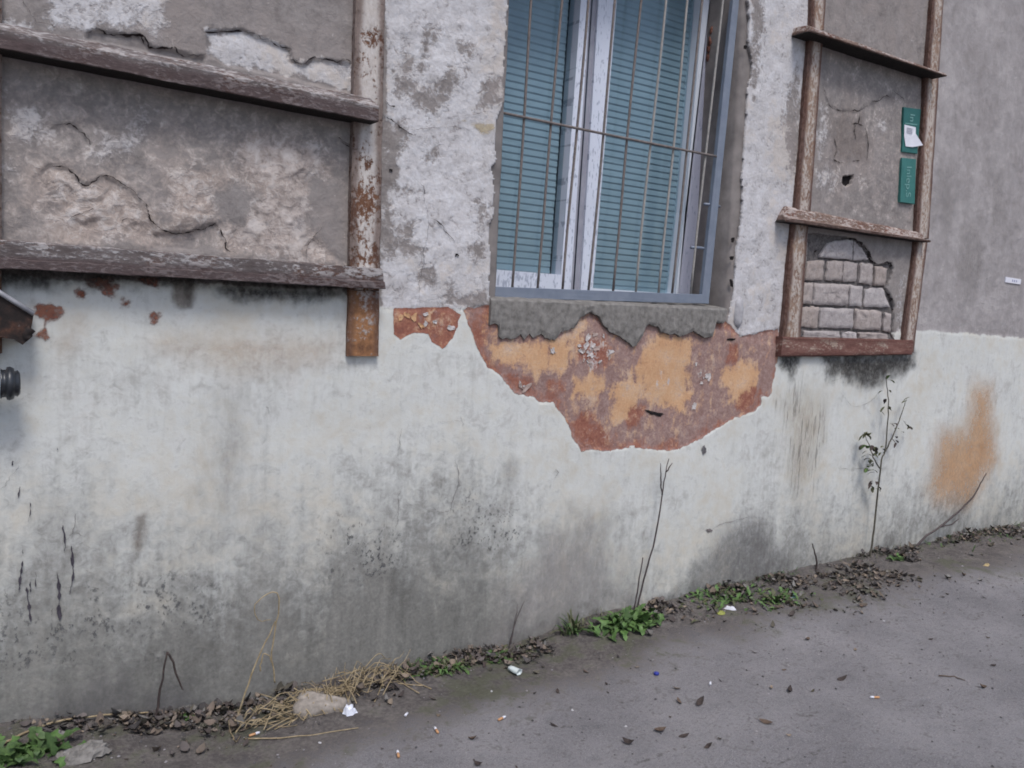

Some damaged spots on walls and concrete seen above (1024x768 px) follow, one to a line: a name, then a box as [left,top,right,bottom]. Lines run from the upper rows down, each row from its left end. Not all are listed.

crack [89,28,351,65]
crack [824,90,904,163]
crack [49,164,231,252]
rust [34,304,64,340]
rust [74,278,119,298]
flaking render [800,233,895,339]
peeling [393,305,779,455]
rust [934,393,994,497]